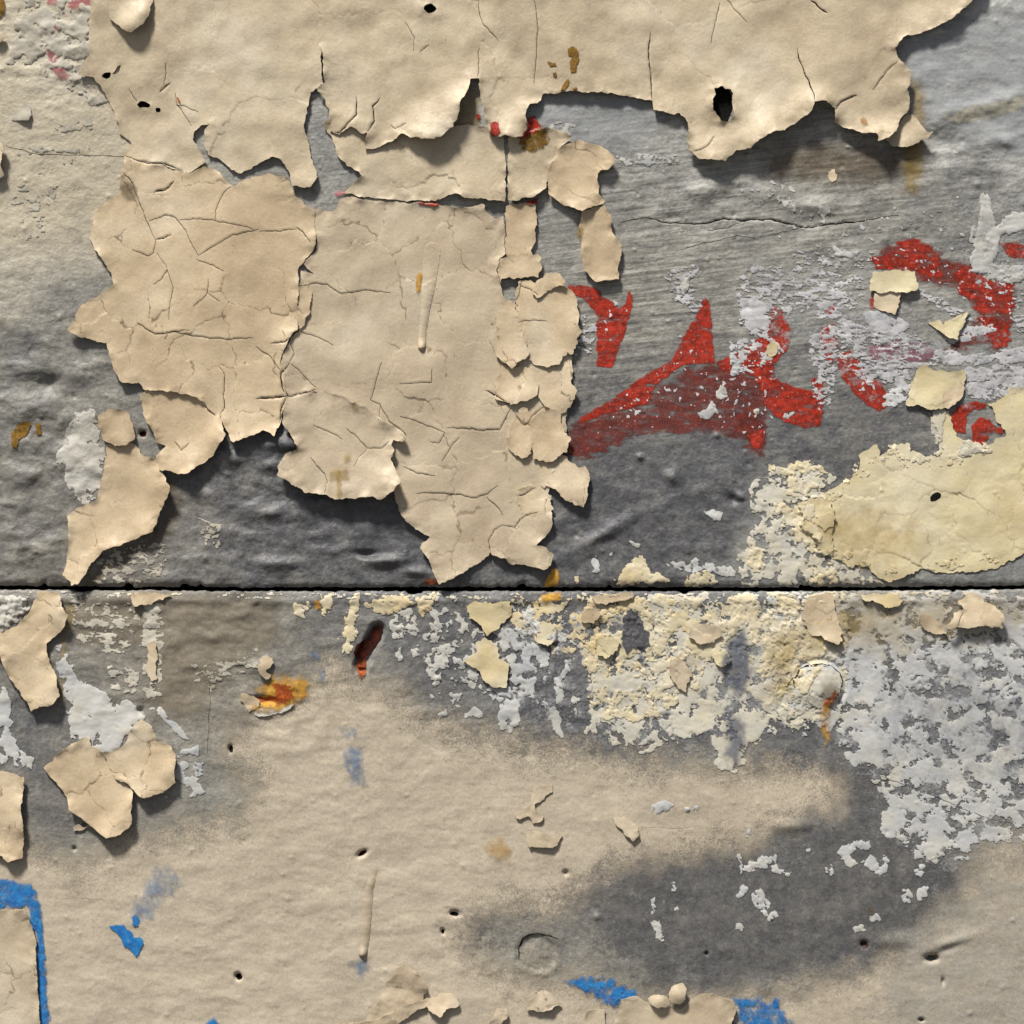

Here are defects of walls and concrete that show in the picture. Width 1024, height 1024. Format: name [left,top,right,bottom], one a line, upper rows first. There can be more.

crack [620,215,899,251]
peeling [0,0,972,862]
rust [353,625,382,678]
rust [255,676,309,712]
peeling [335,964,459,1024]
peeling [489,1008,508,1024]
peeling [526,990,561,1012]
peeling [585,993,736,1024]